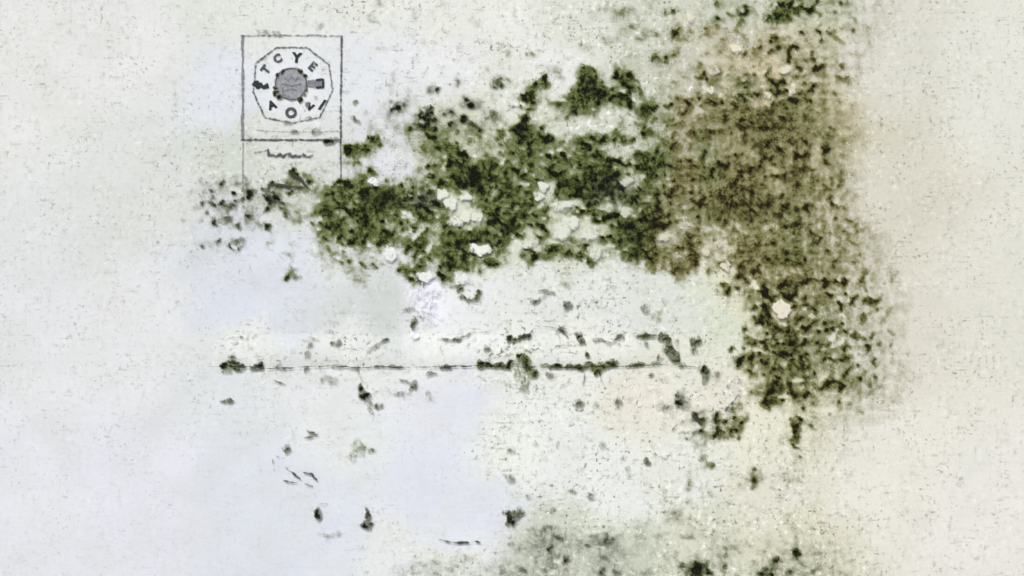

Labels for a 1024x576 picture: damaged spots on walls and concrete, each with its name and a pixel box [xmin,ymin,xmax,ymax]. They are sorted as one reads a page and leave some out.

mould [750,0,857,26]
leakage [199,63,645,302]
peeling [437,189,483,226]
peeling [534,181,601,261]
peeling [470,243,492,257]
peeling [772,299,792,319]
crack [208,334,700,384]
crack [506,326,568,340]
leakage [477,304,702,391]
leakage [662,282,895,469]
leakage [677,545,740,576]
mould [753,543,842,576]